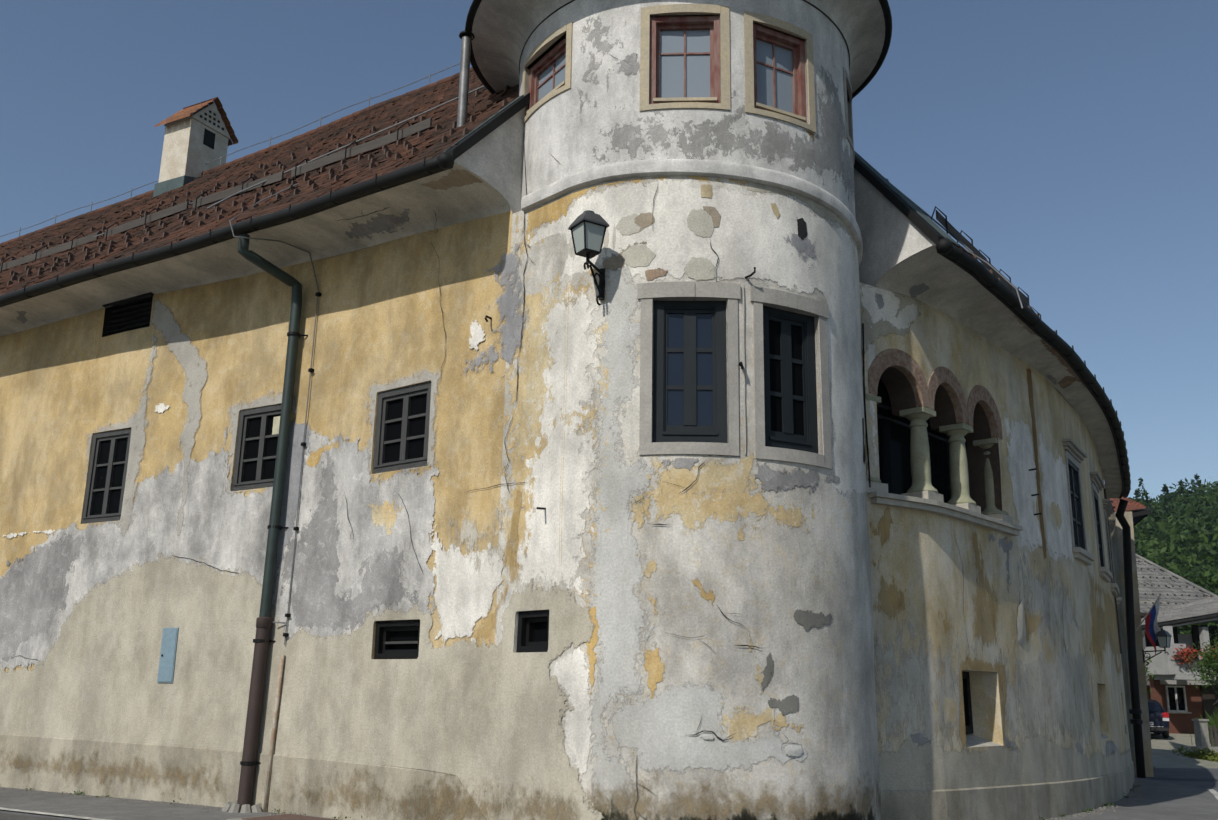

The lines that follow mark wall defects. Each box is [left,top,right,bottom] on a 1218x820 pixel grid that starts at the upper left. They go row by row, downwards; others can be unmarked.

flaking render [617,53,640,76]
flaking render [422,169,483,190]
peeling [0,176,929,778]
peeling [1002,405,1075,564]
crack [693,717,736,741]
damp [9,754,218,794]
damp [306,772,572,820]
damp [590,780,881,820]